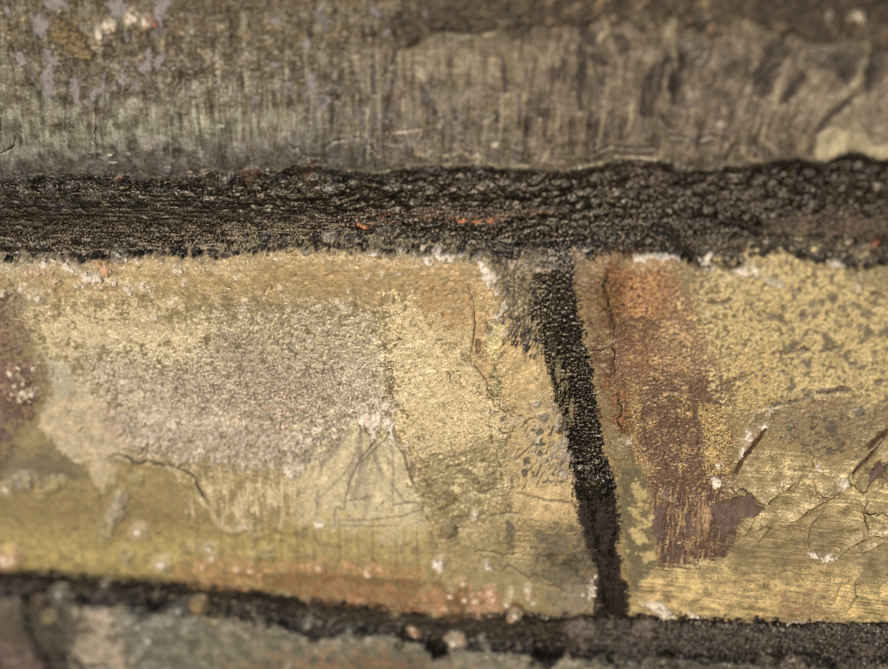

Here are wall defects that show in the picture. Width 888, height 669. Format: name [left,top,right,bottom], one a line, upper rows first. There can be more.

corrosion [590,251,677,433]
damp [120,413,314,478]
damp [353,399,401,447]
peeling [651,505,667,540]
peeling [708,495,765,537]
crack [724,430,796,506]
crack [789,431,888,561]
peeling [869,462,888,483]
crack [806,621,888,629]